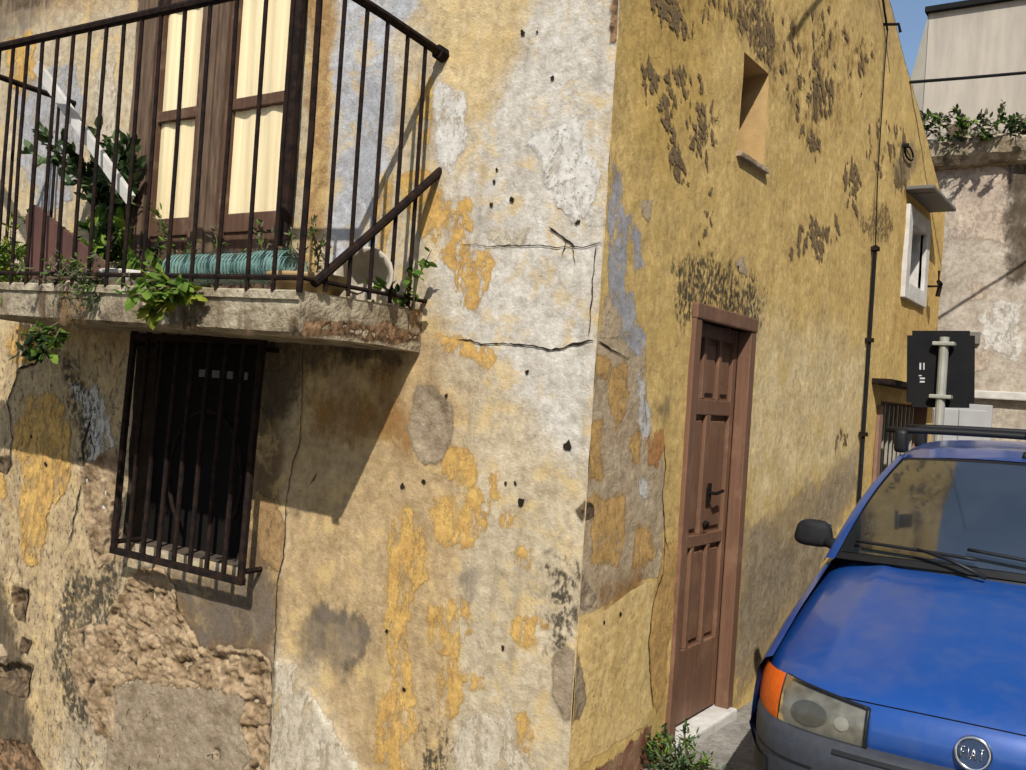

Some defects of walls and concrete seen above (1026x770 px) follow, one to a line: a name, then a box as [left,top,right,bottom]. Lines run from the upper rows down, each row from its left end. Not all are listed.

flaking render [289,316,420,344]
peeling [358,75,530,310]
crack [458,227,629,359]
peeling [641,55,718,185]
peeling [651,0,874,162]
peeling [790,213,841,263]
peeling [0,382,122,568]
flaking render [69,566,273,770]
flaking render [372,384,516,770]
peeling [426,598,537,770]
peeling [525,115,678,770]
crack [644,399,668,708]